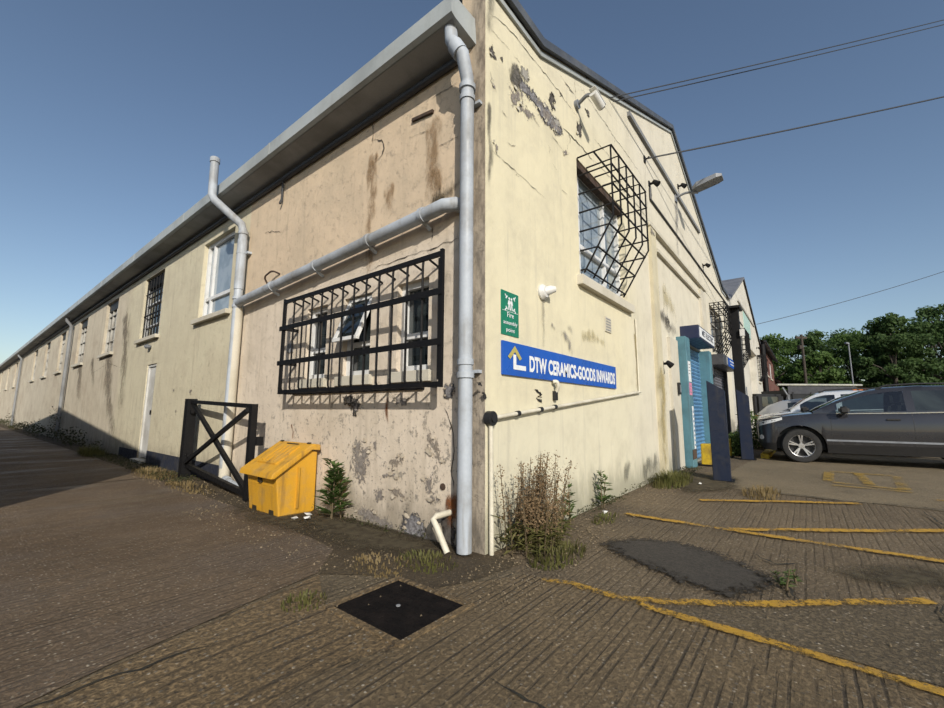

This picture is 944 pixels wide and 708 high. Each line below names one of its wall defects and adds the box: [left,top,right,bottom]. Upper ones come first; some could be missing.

flaking render [509,66,564,136]
water stain [426,118,453,203]
water stain [105,316,129,413]
flaking render [444,383,456,400]
peeling [425,432,444,464]
flaking render [348,438,428,539]
peeling [421,474,442,505]